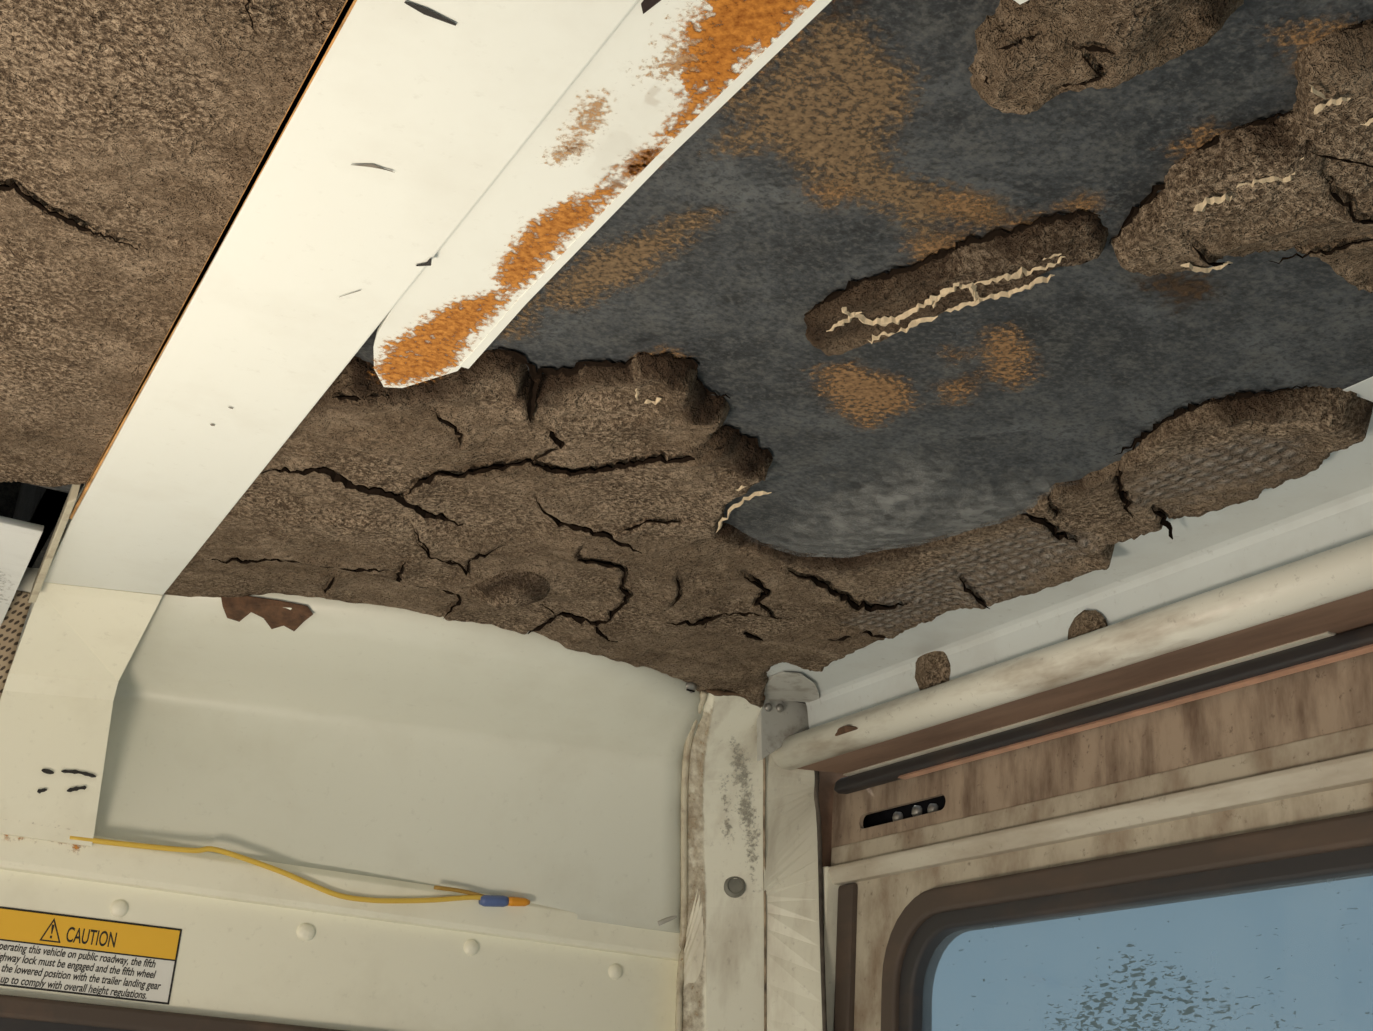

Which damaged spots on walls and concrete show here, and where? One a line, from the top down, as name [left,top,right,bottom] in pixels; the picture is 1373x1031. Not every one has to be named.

peeling [641,0,661,14]
crack [0,182,138,250]
rust [372,0,816,386]
peeling [1193,157,1304,212]
crack [1267,147,1373,264]
peeling [826,253,1065,344]
peeling [1180,261,1232,273]
crack [211,376,724,642]
peeling [716,485,772,533]
crack [667,570,907,641]
crack [960,579,990,609]
leakage [723,744,760,875]